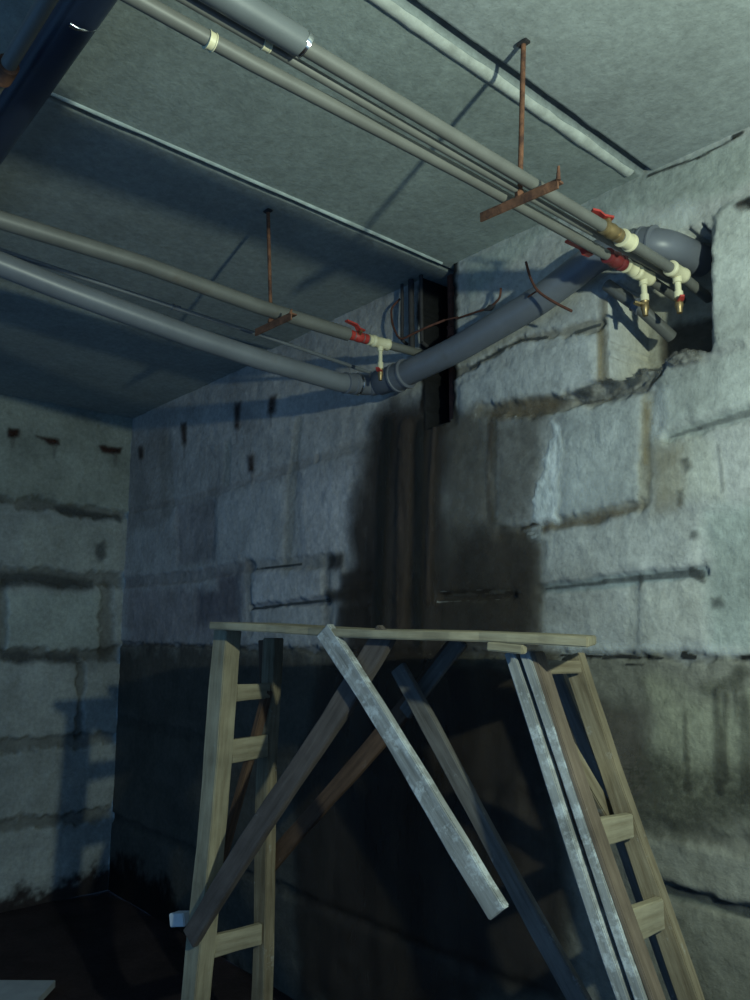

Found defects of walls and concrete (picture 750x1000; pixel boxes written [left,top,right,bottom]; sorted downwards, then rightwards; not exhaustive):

spalling [668,350,700,366]
spalling [563,371,661,403]